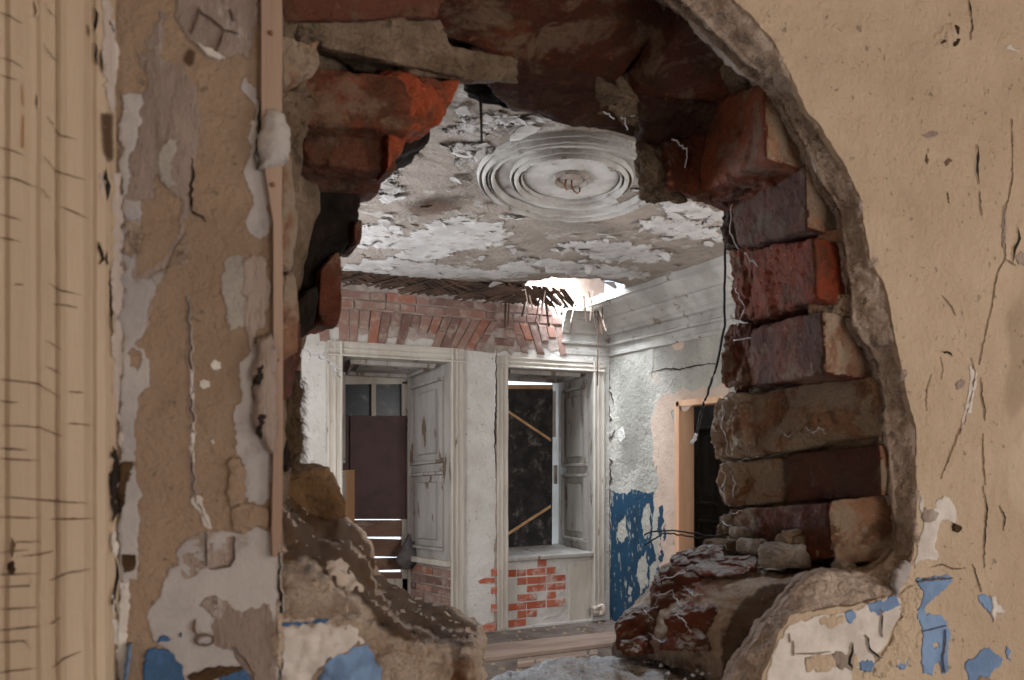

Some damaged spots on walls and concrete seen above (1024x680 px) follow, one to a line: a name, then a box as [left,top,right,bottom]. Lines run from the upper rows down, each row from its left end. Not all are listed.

crack [188,157,207,222]
crack [185,295,212,529]
peeling [91,0,567,680]
flaking render [319,105,724,356]
crack [652,363,719,372]
flaking render [609,0,962,680]
crack [925,119,1021,592]
peeling [964,646,1012,680]
peeling [978,593,1005,622]